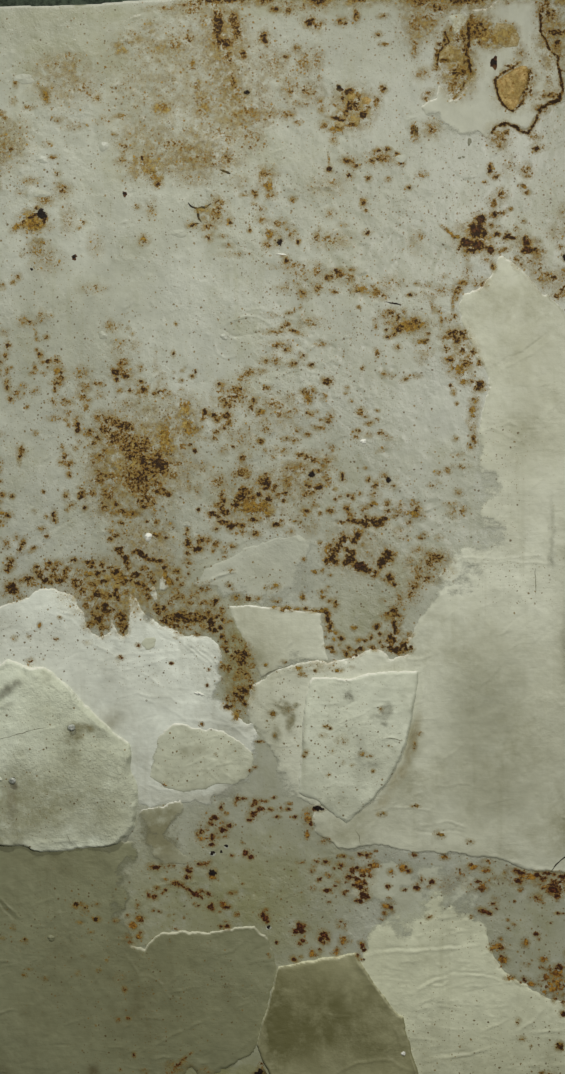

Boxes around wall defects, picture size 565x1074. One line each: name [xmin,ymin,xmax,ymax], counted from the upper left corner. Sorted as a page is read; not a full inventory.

peeling [449,14,466,34]
rust [0,0,565,721]
peeling [150,575,169,601]
rust [195,796,330,848]
rust [113,861,243,944]
rust [288,919,367,962]
rust [298,850,565,947]
rust [486,919,565,1018]